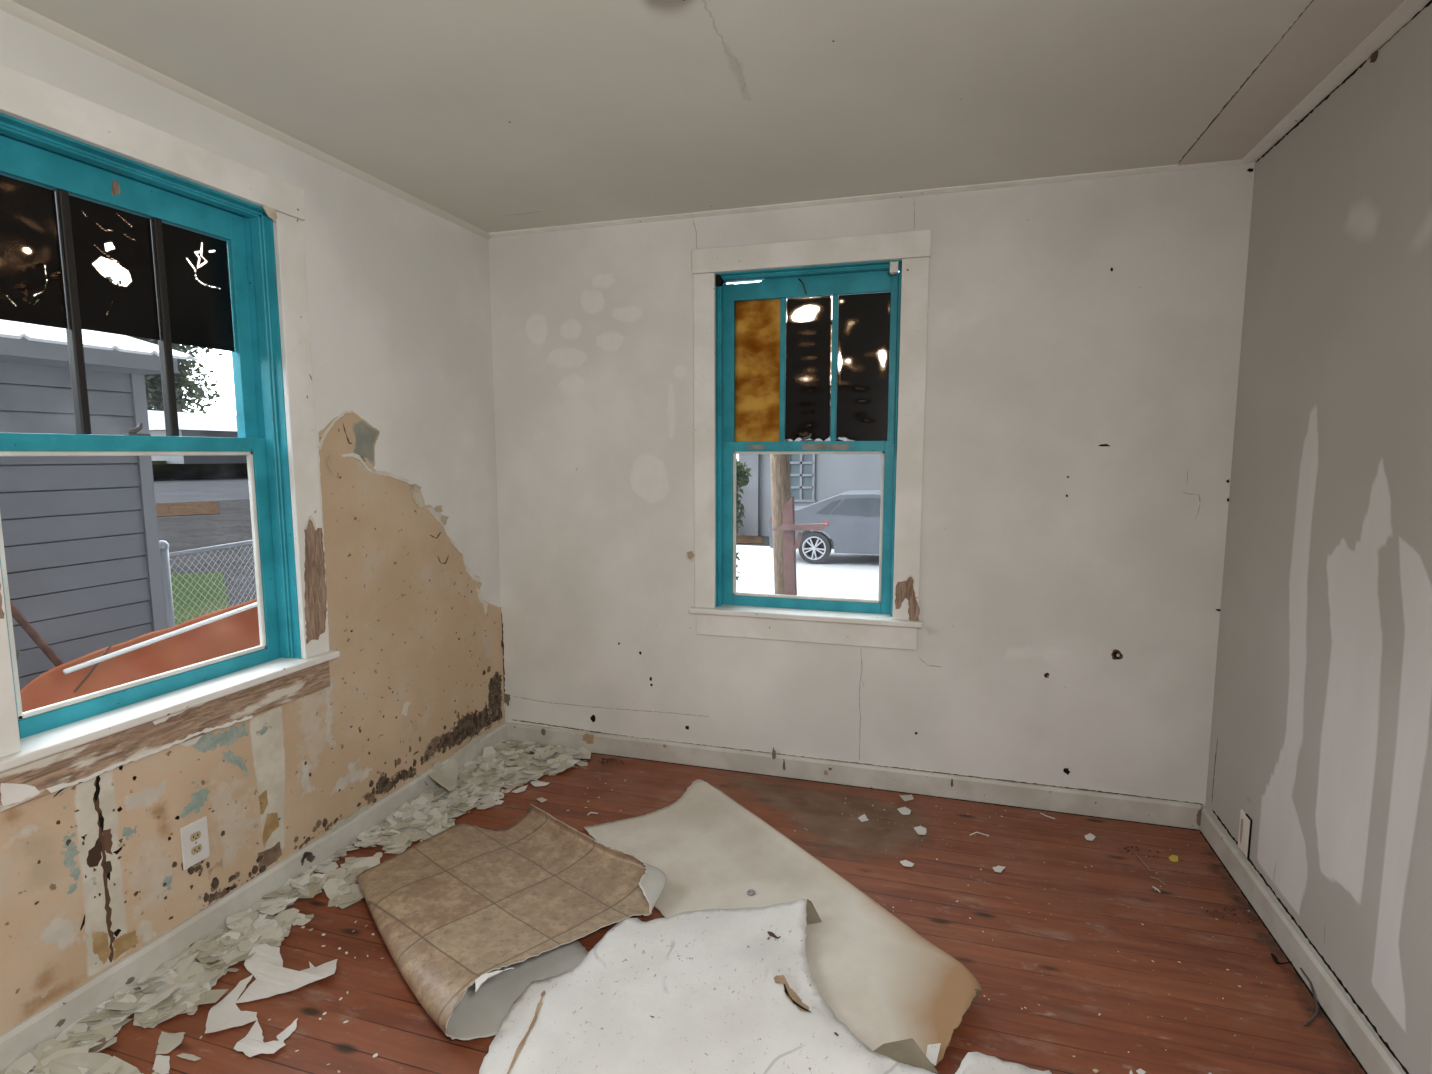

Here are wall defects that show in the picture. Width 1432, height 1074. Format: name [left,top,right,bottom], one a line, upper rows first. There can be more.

crack [702,0,754,101]
peeling [895,575,920,621]
peeling [0,411,510,1034]
water stain [294,666,505,850]
crack [53,775,114,963]